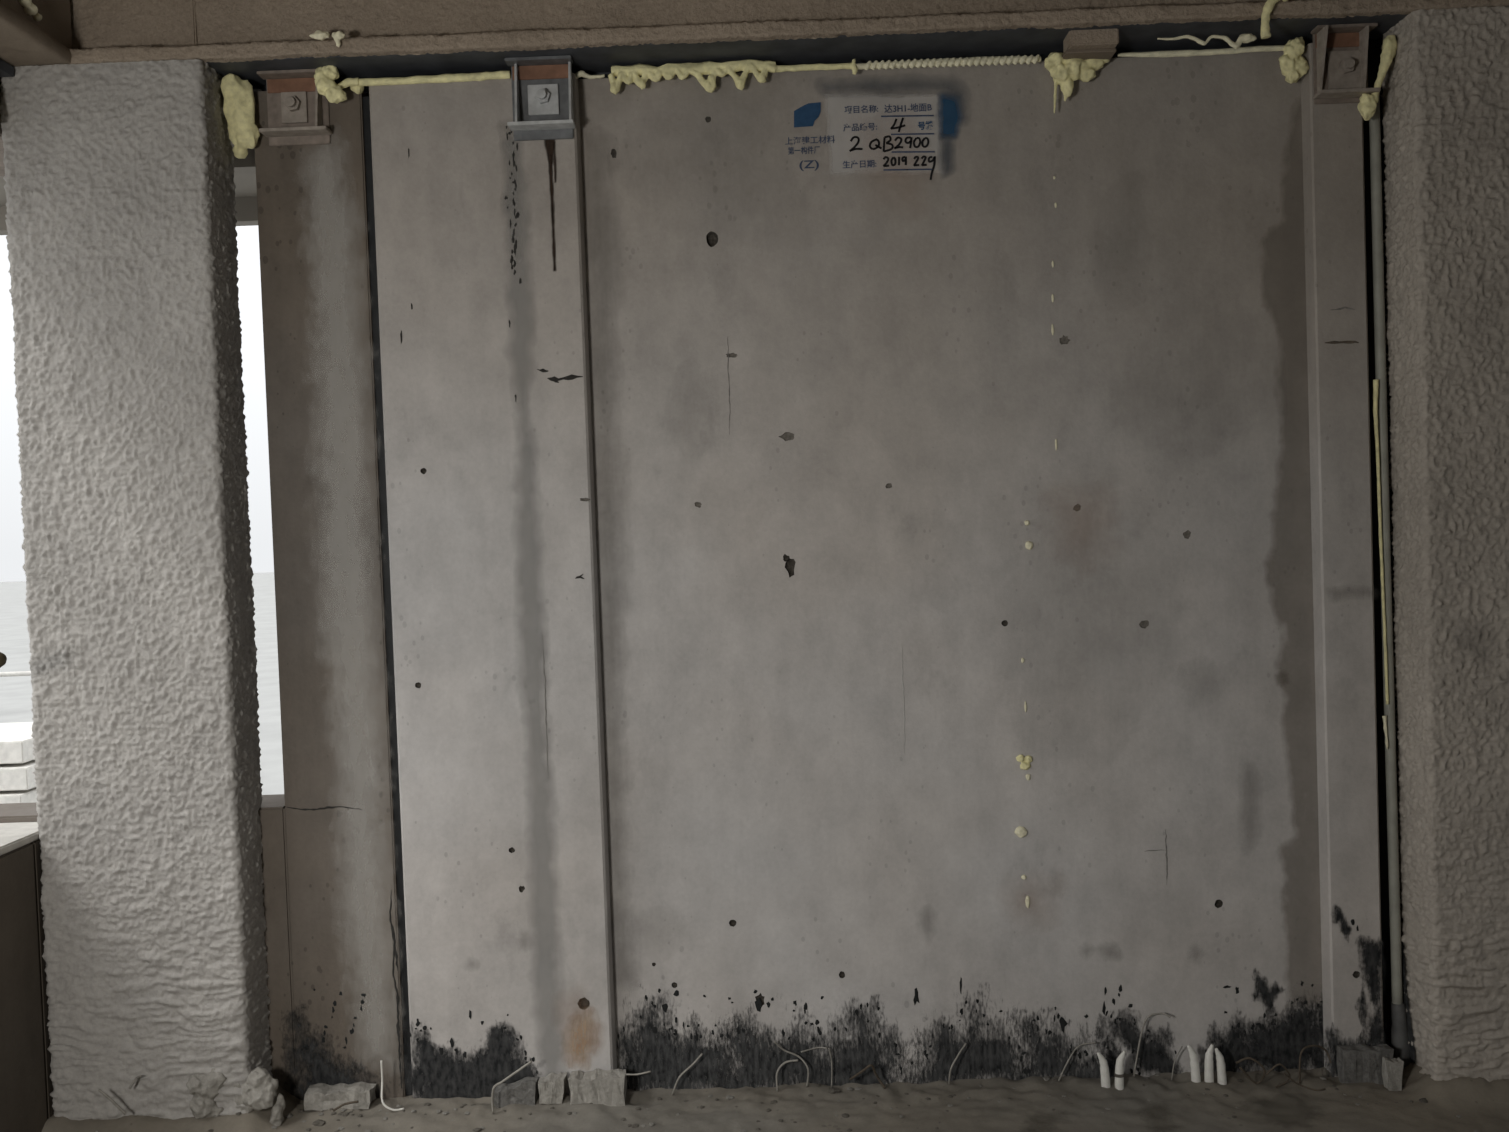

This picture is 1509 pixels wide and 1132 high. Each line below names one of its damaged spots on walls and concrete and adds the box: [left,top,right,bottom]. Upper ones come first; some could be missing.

leakage [545,140,556,271]
leakage [285,992,379,1100]
leakage [401,1010,539,1099]
leakage [617,978,1181,1091]
leakage [1201,906,1384,1077]
leakage [1401,933,1415,1062]